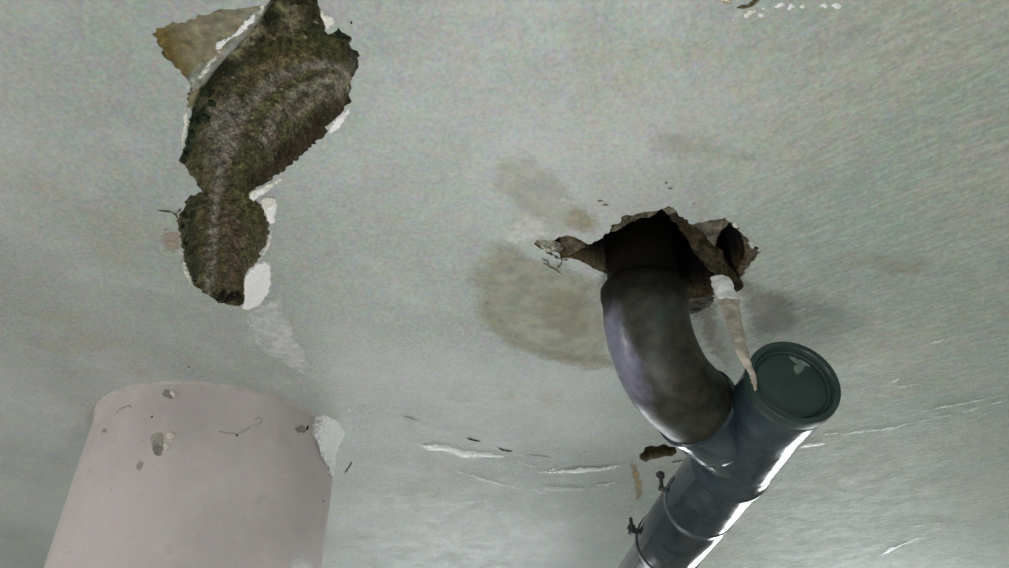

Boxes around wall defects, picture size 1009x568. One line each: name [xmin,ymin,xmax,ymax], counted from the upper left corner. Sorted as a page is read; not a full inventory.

spalling [722,0,806,21]
spalling [152,0,360,310]
hole [534,206,761,314]
spalling [295,414,345,476]